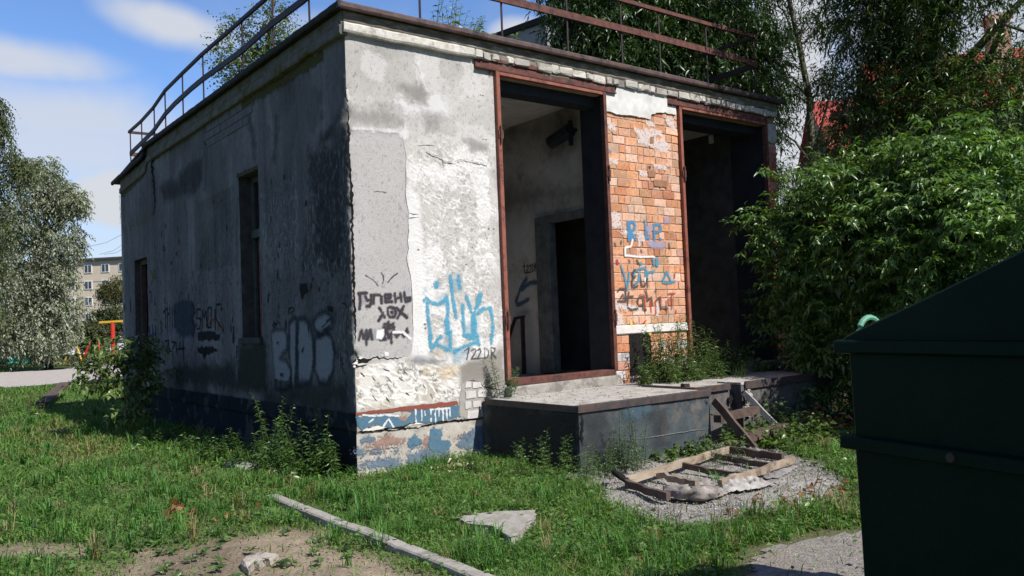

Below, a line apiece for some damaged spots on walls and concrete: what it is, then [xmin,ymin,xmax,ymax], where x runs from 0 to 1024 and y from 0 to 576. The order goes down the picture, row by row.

crack [143,150,171,216]
spalling [648,170,668,188]
peeling [352,356,484,472]